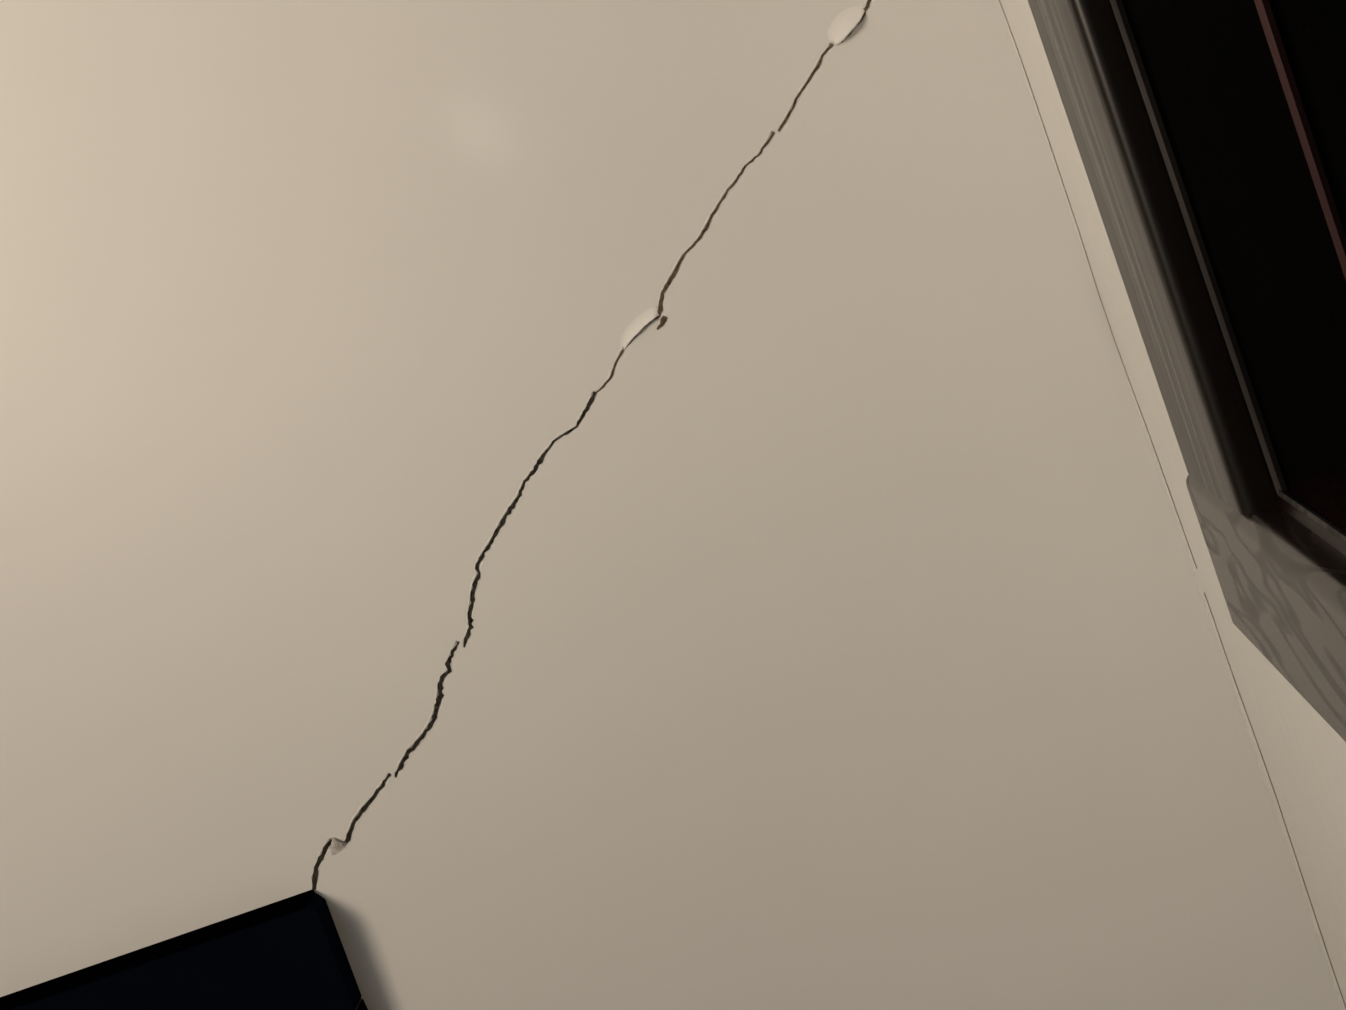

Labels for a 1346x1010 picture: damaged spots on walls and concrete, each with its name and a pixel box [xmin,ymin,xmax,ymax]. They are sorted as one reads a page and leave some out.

crack [311,0,872,889]
peeling [619,306,659,355]
peeling [827,5,865,45]
crack [999,0,1346,1008]